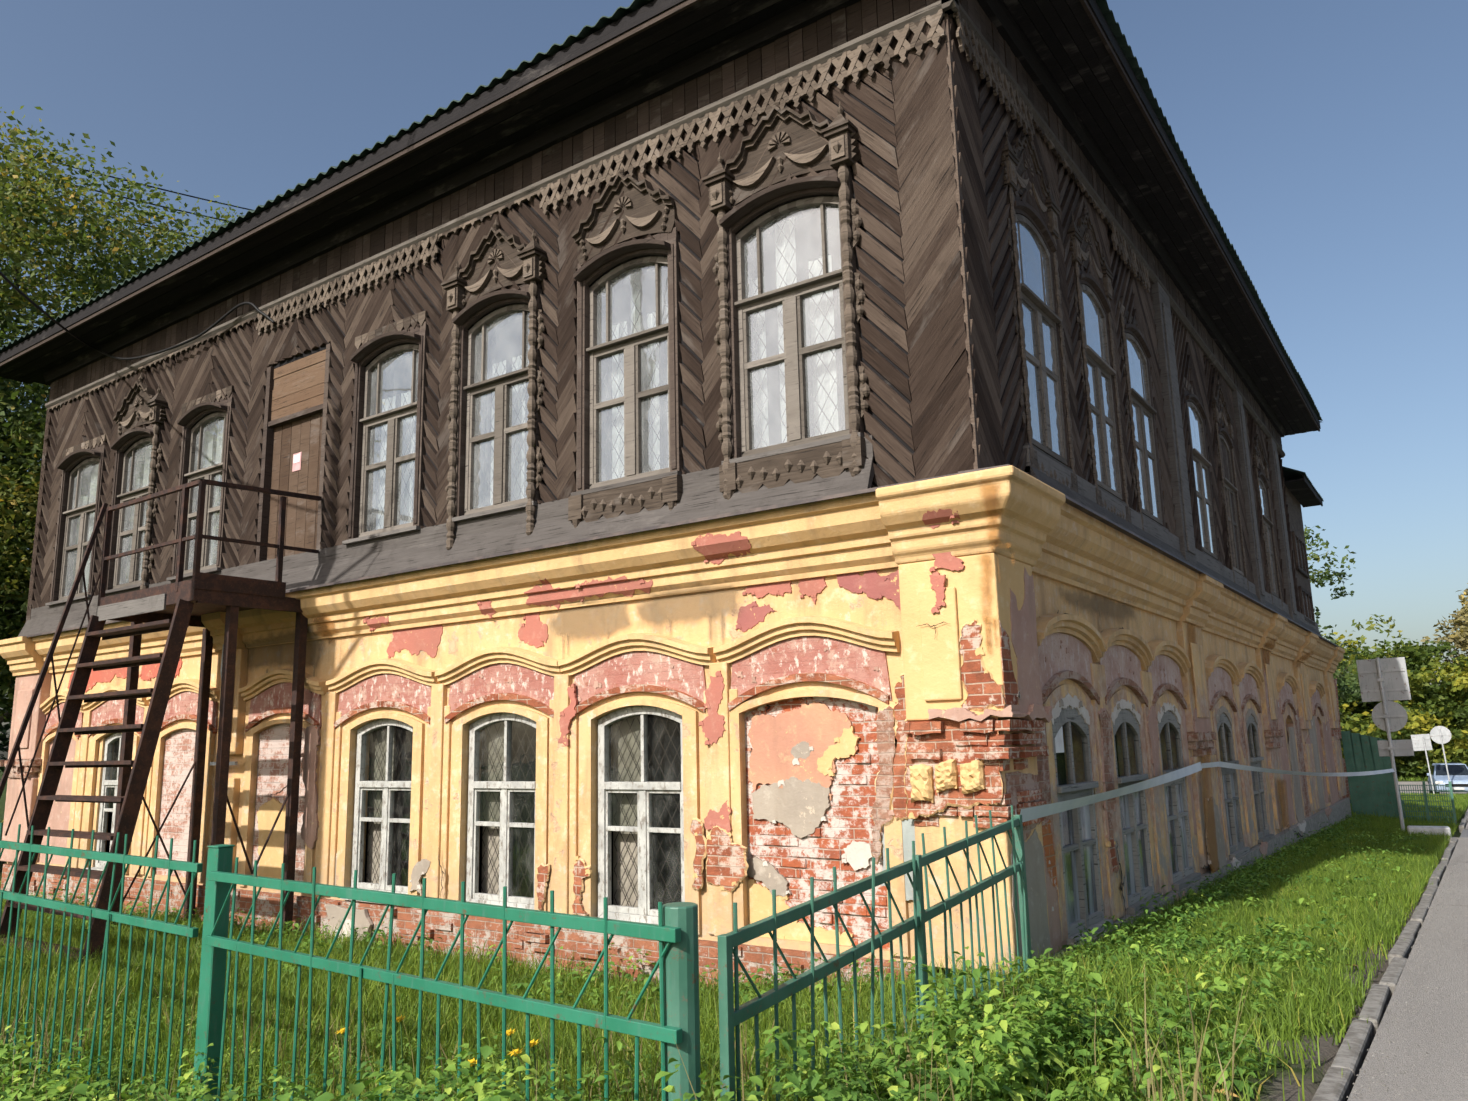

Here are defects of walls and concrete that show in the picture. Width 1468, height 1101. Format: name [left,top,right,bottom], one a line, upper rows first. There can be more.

peeling [691,531,752,565]
peeling [929,552,965,614]
flaking render [248,567,1183,971]
peeling [1206,662,1311,835]